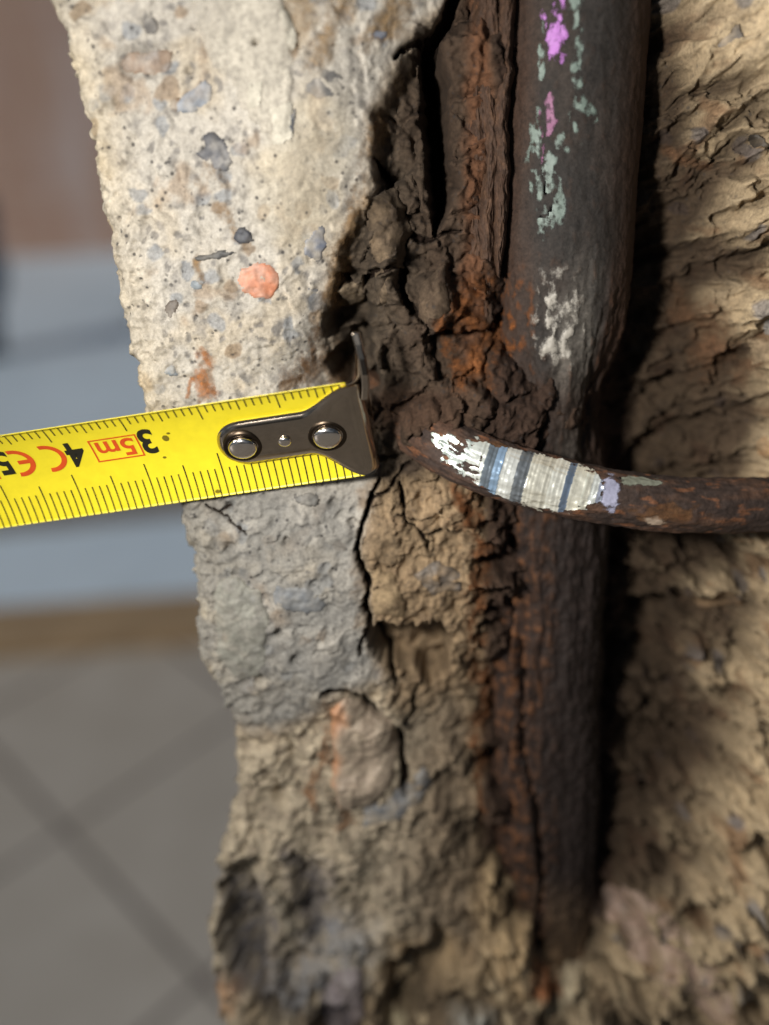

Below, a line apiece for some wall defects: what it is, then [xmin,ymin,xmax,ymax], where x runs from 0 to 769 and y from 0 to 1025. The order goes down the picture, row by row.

rust [436,279,522,388]
crack [320,460,457,788]
rust [452,484,490,612]
spalling [200,0,769,1025]